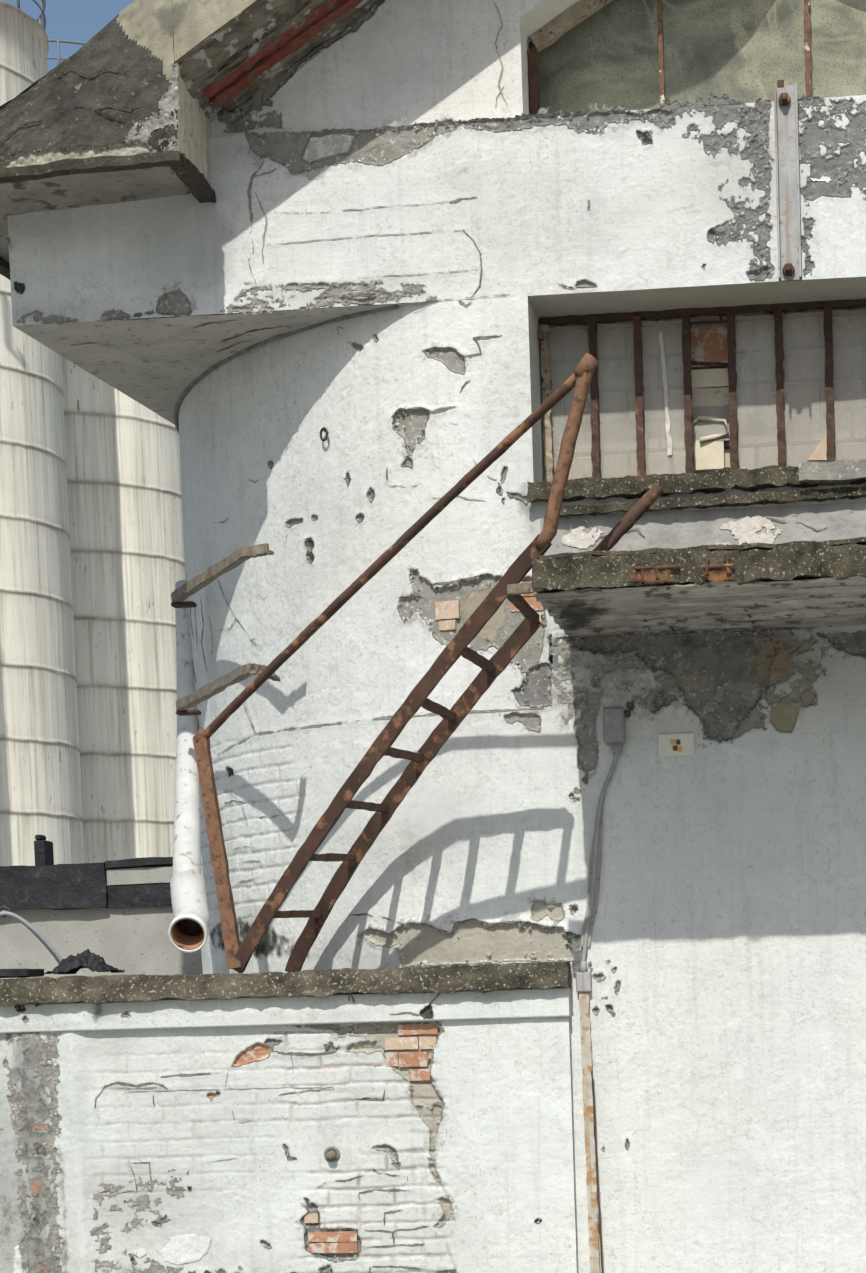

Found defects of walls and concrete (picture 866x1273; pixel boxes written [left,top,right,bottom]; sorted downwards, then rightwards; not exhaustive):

spalling [0,63,181,168]
peeling [220,280,437,316]
crack [247,161,510,307]
peeling [798,95,866,277]
spalling [386,335,502,480]
spalling [355,487,375,523]
spalling [397,568,502,645]
spalling [467,577,866,801]
spalling [348,898,621,1016]
spalling [207,1021,445,1181]
peeling [90,1169,242,1273]
flaking render [300,1144,408,1273]